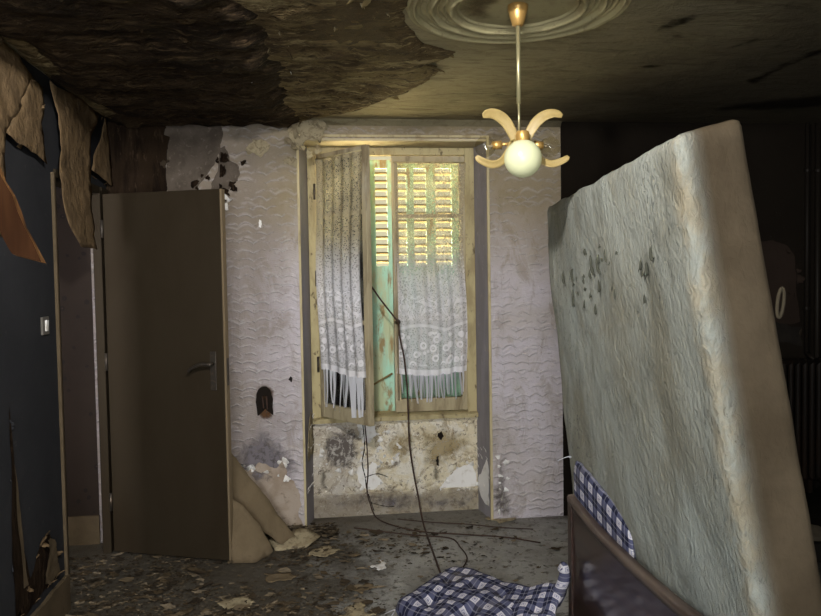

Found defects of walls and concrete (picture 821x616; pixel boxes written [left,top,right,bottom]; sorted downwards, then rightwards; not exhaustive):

flaking render [0,0,329,210]
flaking render [241,457,314,529]